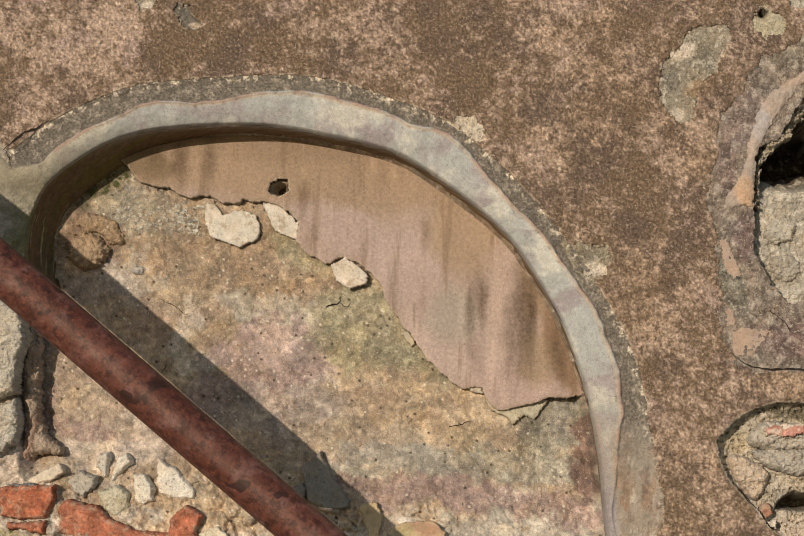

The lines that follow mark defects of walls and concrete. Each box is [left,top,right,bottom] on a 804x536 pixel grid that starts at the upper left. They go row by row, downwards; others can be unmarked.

flaking render [752,5,786,40]
flaking render [659,24,731,124]
flaking render [205,202,261,248]
flaking render [263,202,299,240]
flaking render [701,36,804,376]
flaking render [331,257,369,290]
flaking render [562,238,613,281]
flaking render [466,387,548,425]
flaking render [717,402,804,536]
flaking render [360,502,446,536]